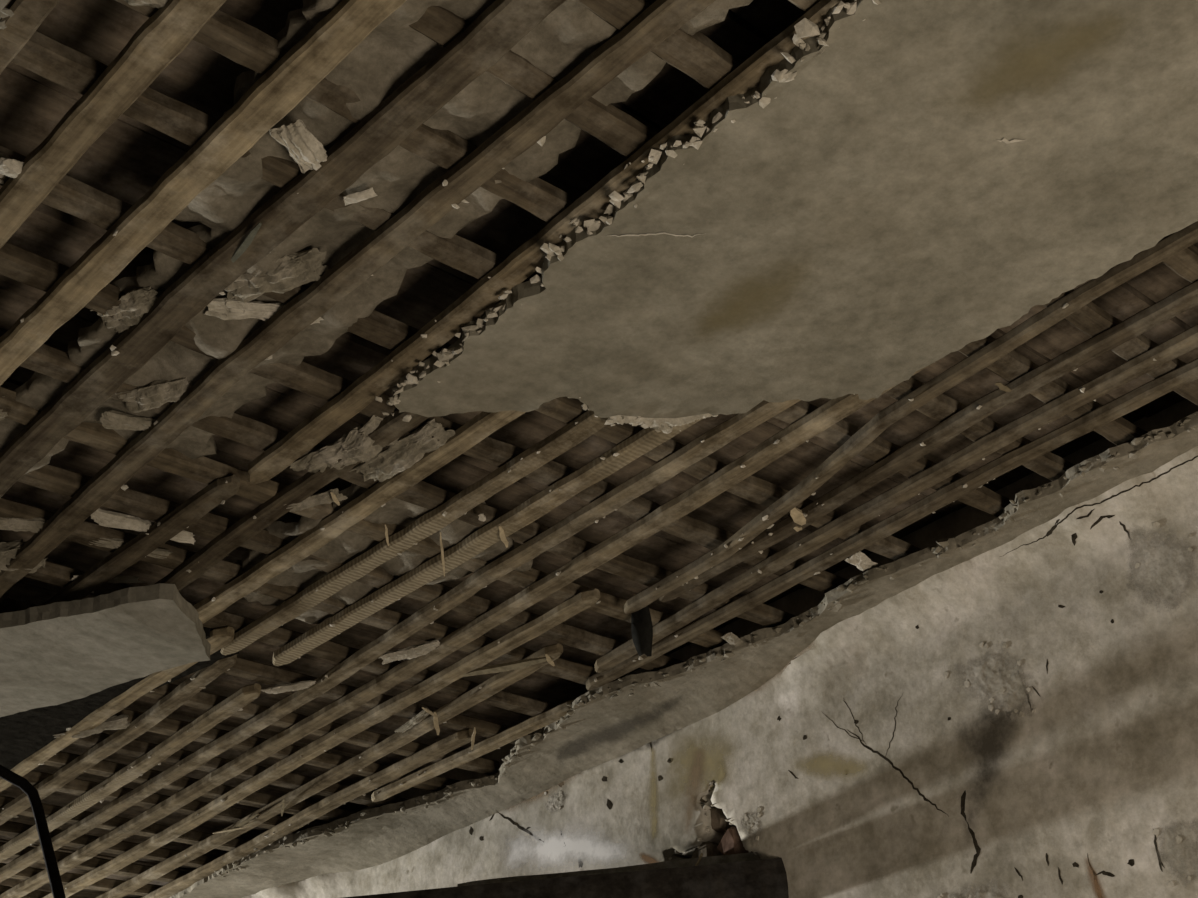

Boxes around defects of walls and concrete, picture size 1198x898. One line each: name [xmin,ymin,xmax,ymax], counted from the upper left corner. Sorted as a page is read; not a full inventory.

spalling [771,0,866,82]
spalling [742,91,777,108]
spalling [530,112,736,287]
spalling [375,290,512,422]
flaking render [568,397,718,434]
spalling [931,418,1196,559]
crack [1000,456,1198,557]
flaking render [944,642,1036,720]
spalling [392,670,669,814]
flaking render [725,807,762,859]
crack [823,694,981,873]